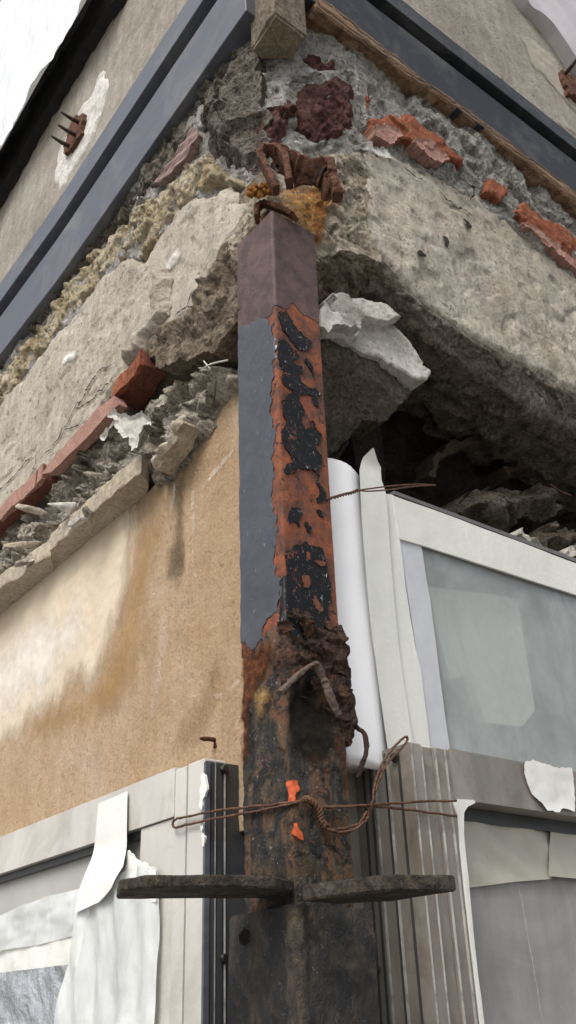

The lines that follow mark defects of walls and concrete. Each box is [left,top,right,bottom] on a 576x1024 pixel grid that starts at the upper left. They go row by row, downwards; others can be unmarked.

peeling [521,36,576,111]
rust [283,185,339,242]
spalling [277,114,576,518]
crack [0,362,115,489]
peeling [100,197,332,651]
water stain [168,481,182,576]
spalling [510,528,542,546]
spalling [558,545,576,557]
rust [241,608,370,793]